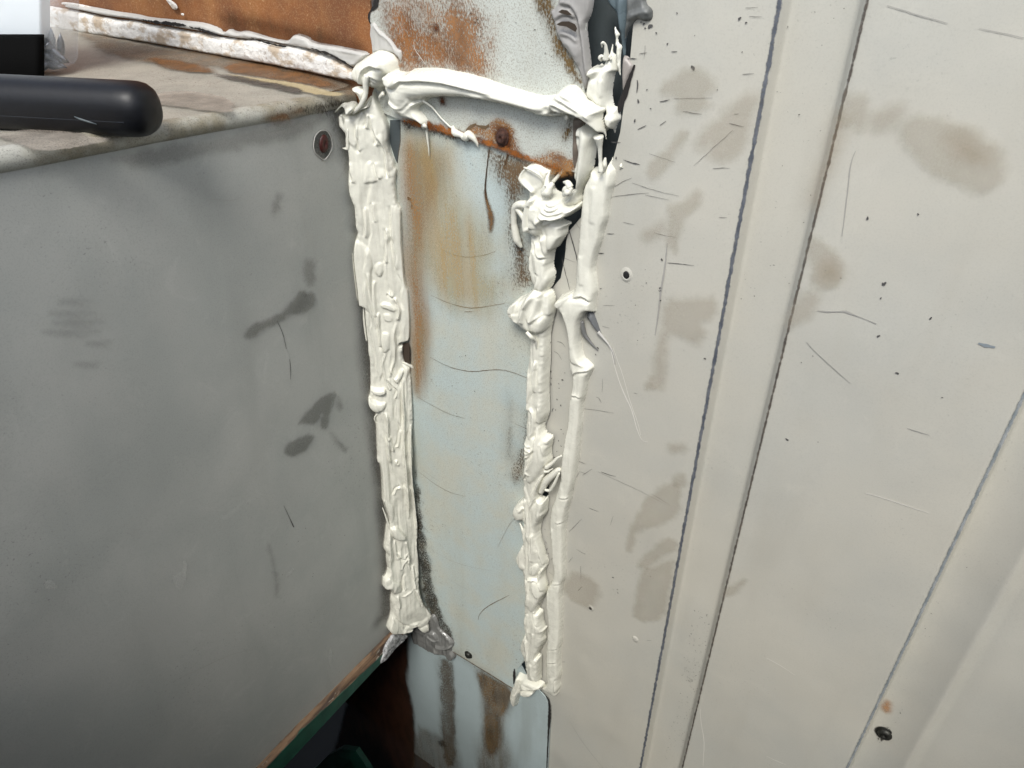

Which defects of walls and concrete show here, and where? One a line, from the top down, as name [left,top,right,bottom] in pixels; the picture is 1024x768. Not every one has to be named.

corrosion [224,15,336,44]
corrosion [383,0,493,76]
corrosion [535,0,584,88]
corrosion [403,118,574,287]
corrosion [406,144,437,389]
corrosion [454,652,512,768]